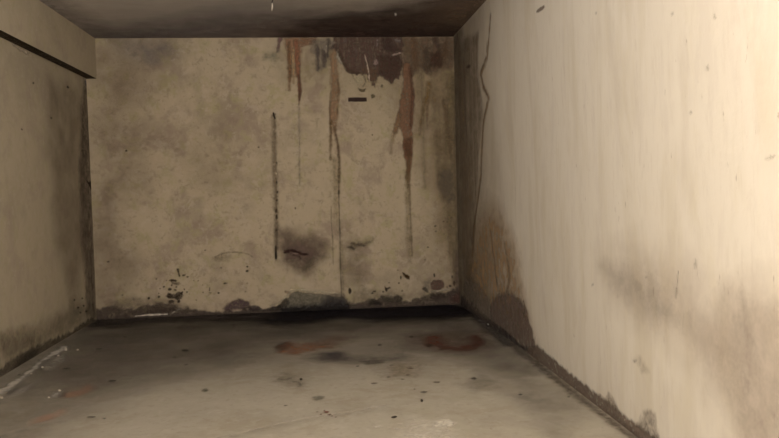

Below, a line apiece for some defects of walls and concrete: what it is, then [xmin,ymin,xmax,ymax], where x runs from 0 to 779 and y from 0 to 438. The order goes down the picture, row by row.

rust [272,37,316,101]
peeling [332,37,404,98]
rust [329,49,340,194]
rust [393,62,431,198]
damp [135,269,189,317]